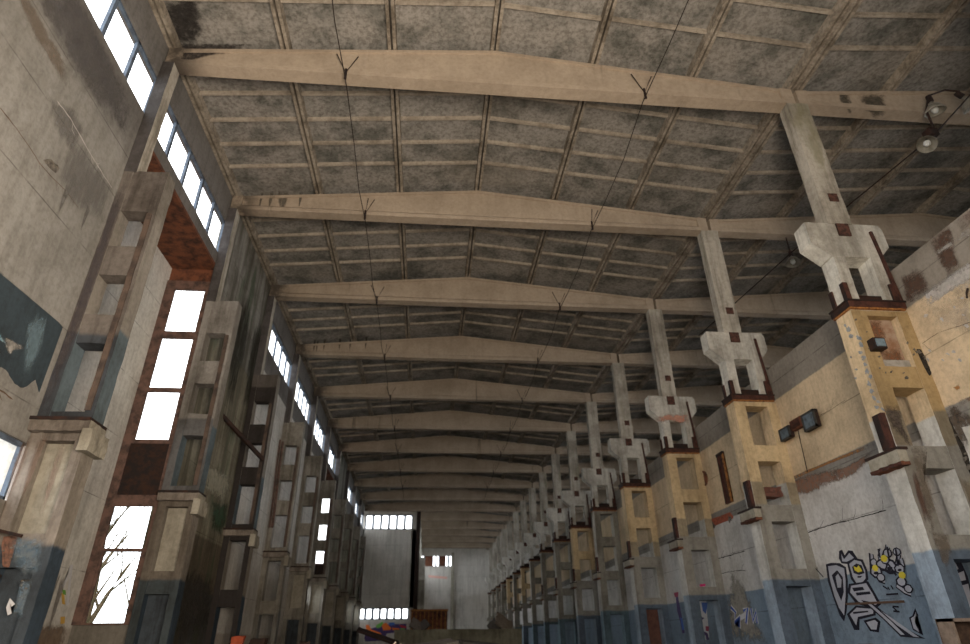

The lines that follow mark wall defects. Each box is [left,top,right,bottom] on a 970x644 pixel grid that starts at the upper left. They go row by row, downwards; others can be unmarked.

damp [167,1,201,44]
peeling [0,273,63,392]
spalling [949,419,970,473]